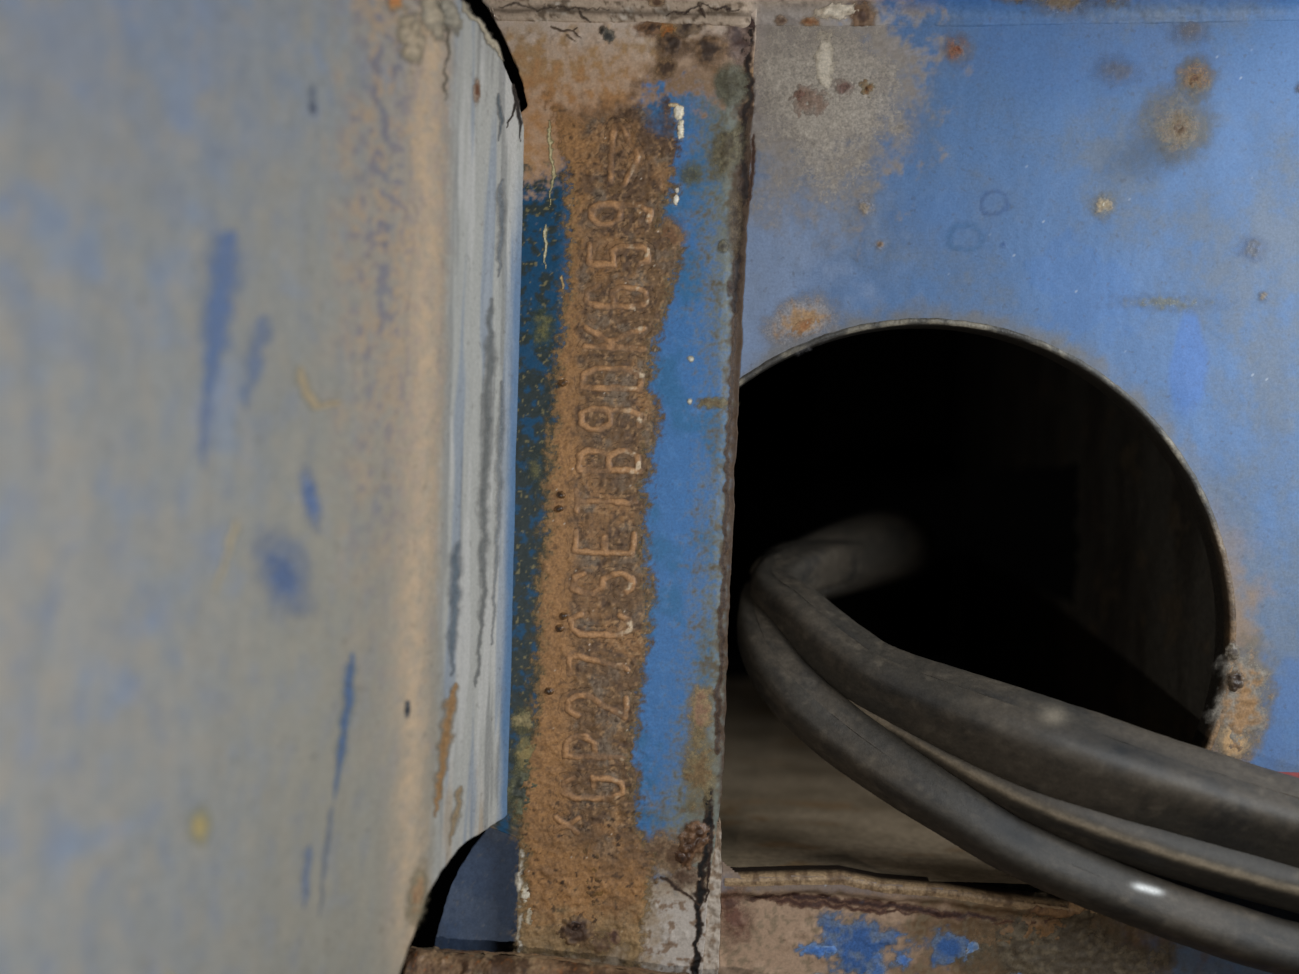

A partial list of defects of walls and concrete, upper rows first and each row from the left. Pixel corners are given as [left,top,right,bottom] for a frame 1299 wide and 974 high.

rust [634,0,755,79]
rust [1004,0,1124,15]
rust [789,78,875,118]
peeling [754,0,910,202]
rust [1149,58,1213,158]
rust [762,295,839,345]
rust [687,397,728,409]
rust [402,98,715,974]
rust [1213,638,1275,759]
rust [720,886,752,943]
peeling [795,911,979,974]
rust [959,909,1177,974]